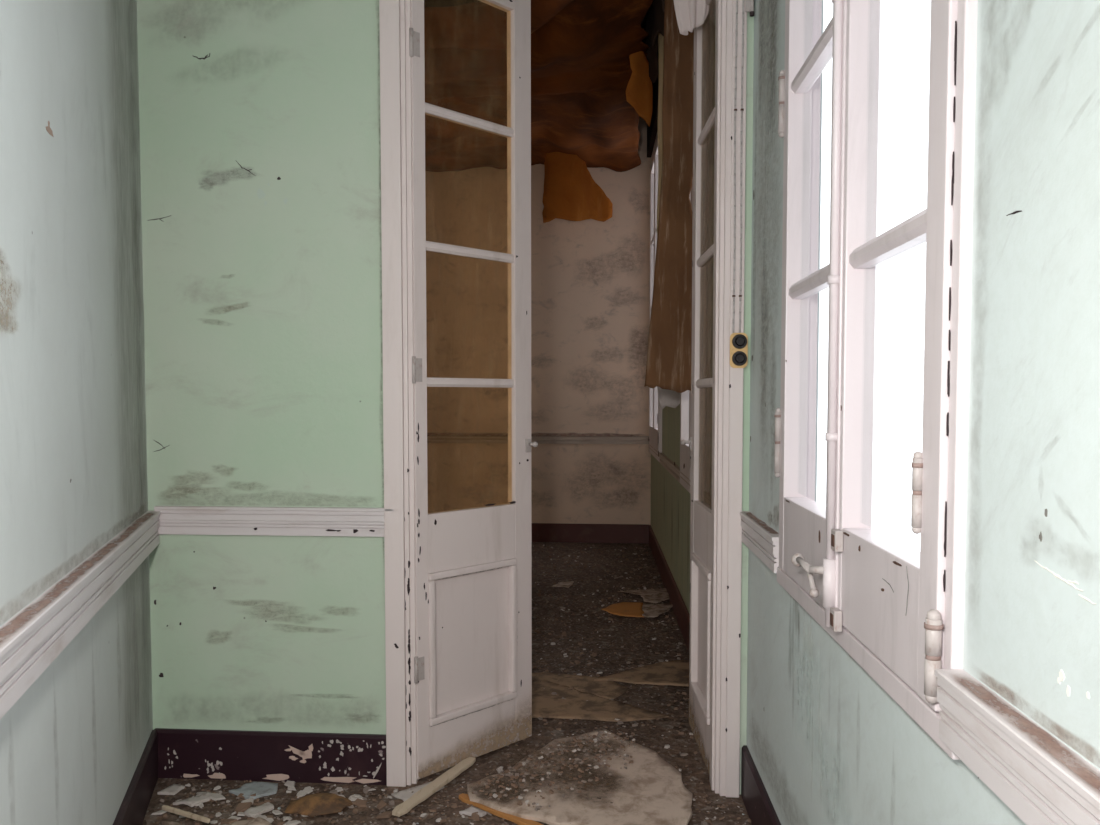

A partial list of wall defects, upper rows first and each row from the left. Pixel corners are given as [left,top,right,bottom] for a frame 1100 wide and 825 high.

peeling [183,747,226,779]
peeling [285,740,386,784]